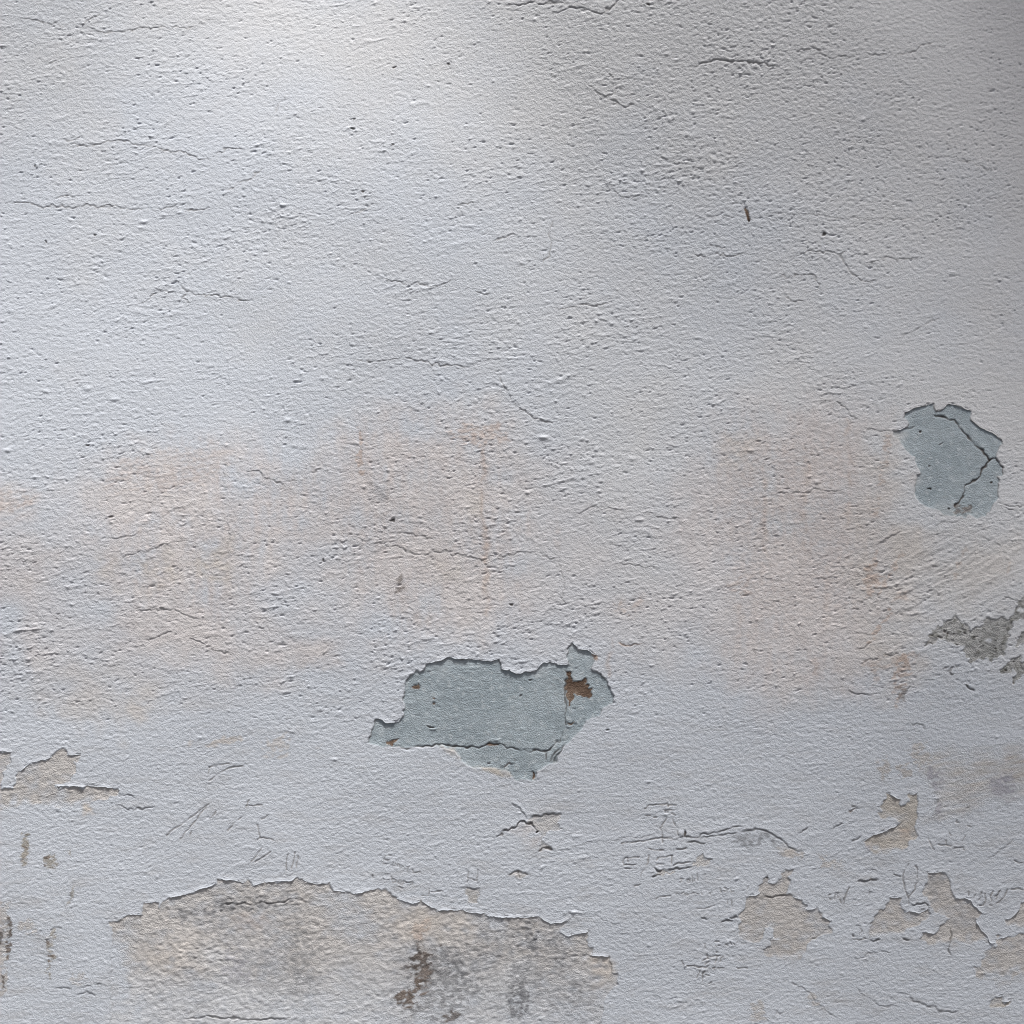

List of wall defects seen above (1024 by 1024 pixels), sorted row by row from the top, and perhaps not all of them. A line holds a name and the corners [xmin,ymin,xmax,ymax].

peeling [891,401,1007,520]
peeling [929,602,1024,686]
peeling [367,641,615,783]
peeling [0,748,120,818]
crack [554,825,805,861]
peeling [832,735,1024,897]
peeling [95,875,619,1024]
peeling [700,845,834,964]
peeling [850,869,1024,1010]